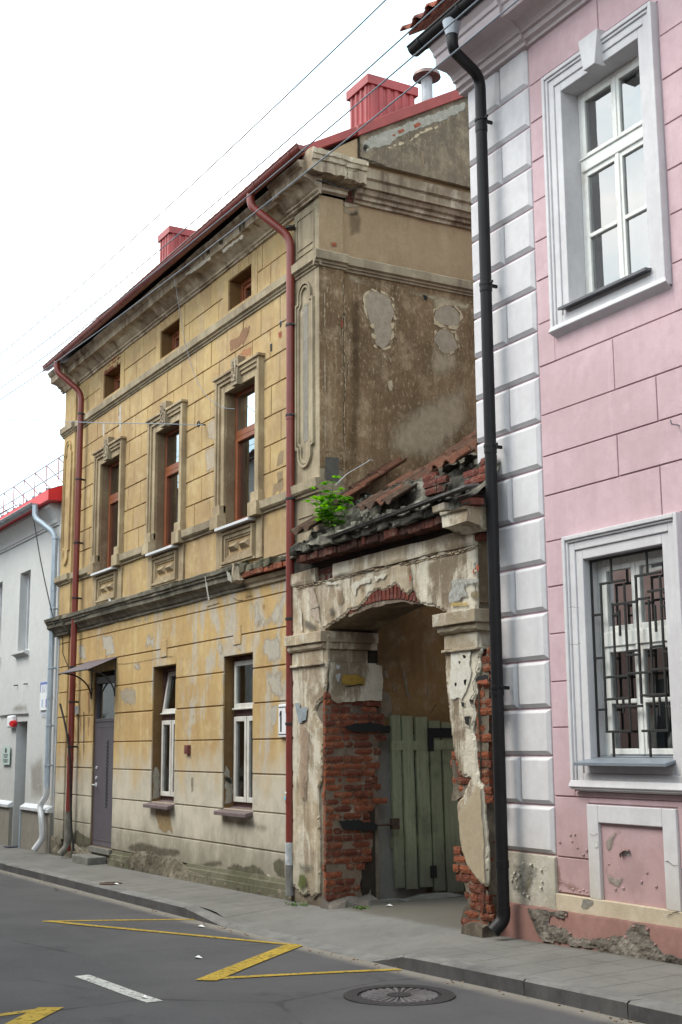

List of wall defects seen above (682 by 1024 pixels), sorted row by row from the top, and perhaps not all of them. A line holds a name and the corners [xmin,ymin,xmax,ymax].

spalling [388,122,438,149]
spalling [307,561,419,624]
peeling [439,565,489,609]
spalling [448,647,494,803]
spalling [322,691,392,901]
damp [129,843,179,856]
damp [205,859,285,878]
spalling [453,846,497,925]
spalling [510,862,682,965]